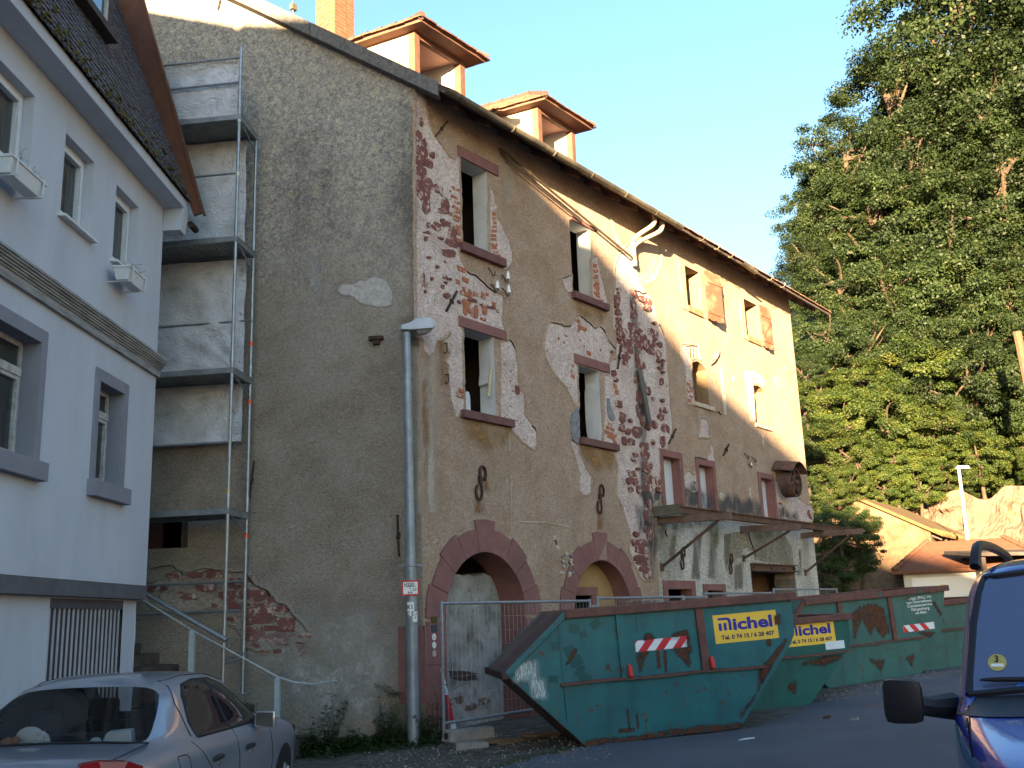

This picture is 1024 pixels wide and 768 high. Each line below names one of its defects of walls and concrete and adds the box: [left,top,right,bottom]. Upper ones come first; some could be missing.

peeling [145,565,315,660]
peeling [412,87,538,452]
peeling [542,244,787,583]
damp [640,462,743,588]